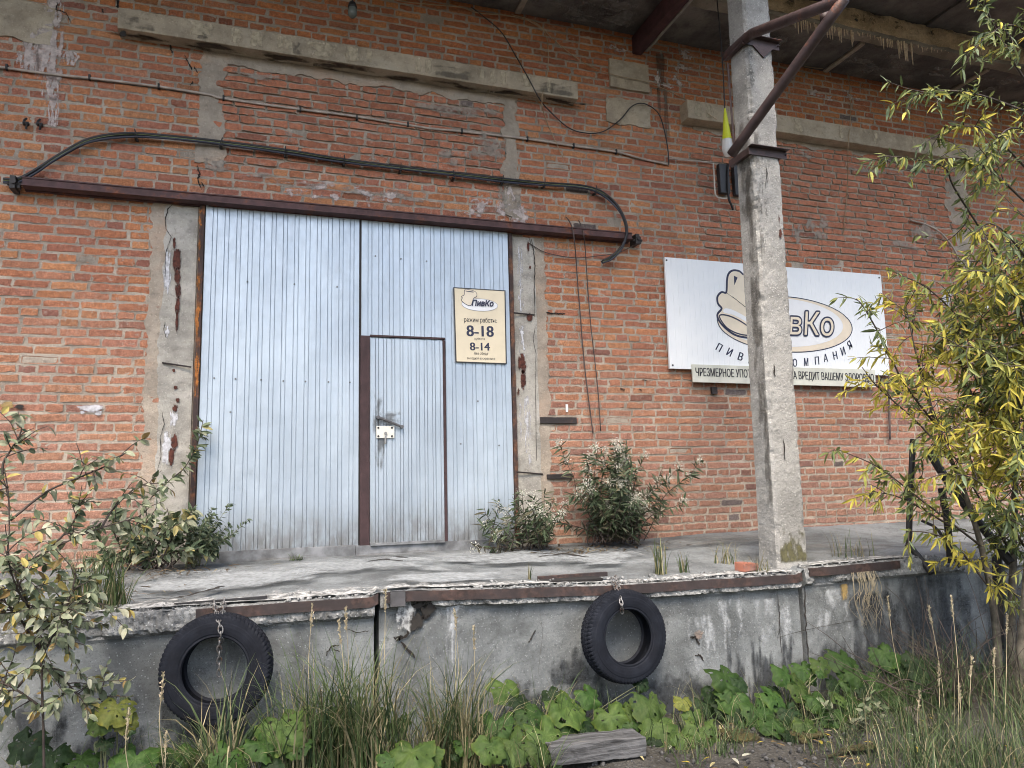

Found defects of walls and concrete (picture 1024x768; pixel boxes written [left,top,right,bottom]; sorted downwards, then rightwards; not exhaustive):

crack [164,205,172,275]
spalling [163,238,181,337]
peeling [162,386,180,466]
spalling [396,601,436,632]
spalling [95,569,792,611]
spalling [805,555,909,565]
leakage [818,575,1023,693]
leakage [726,642,803,703]